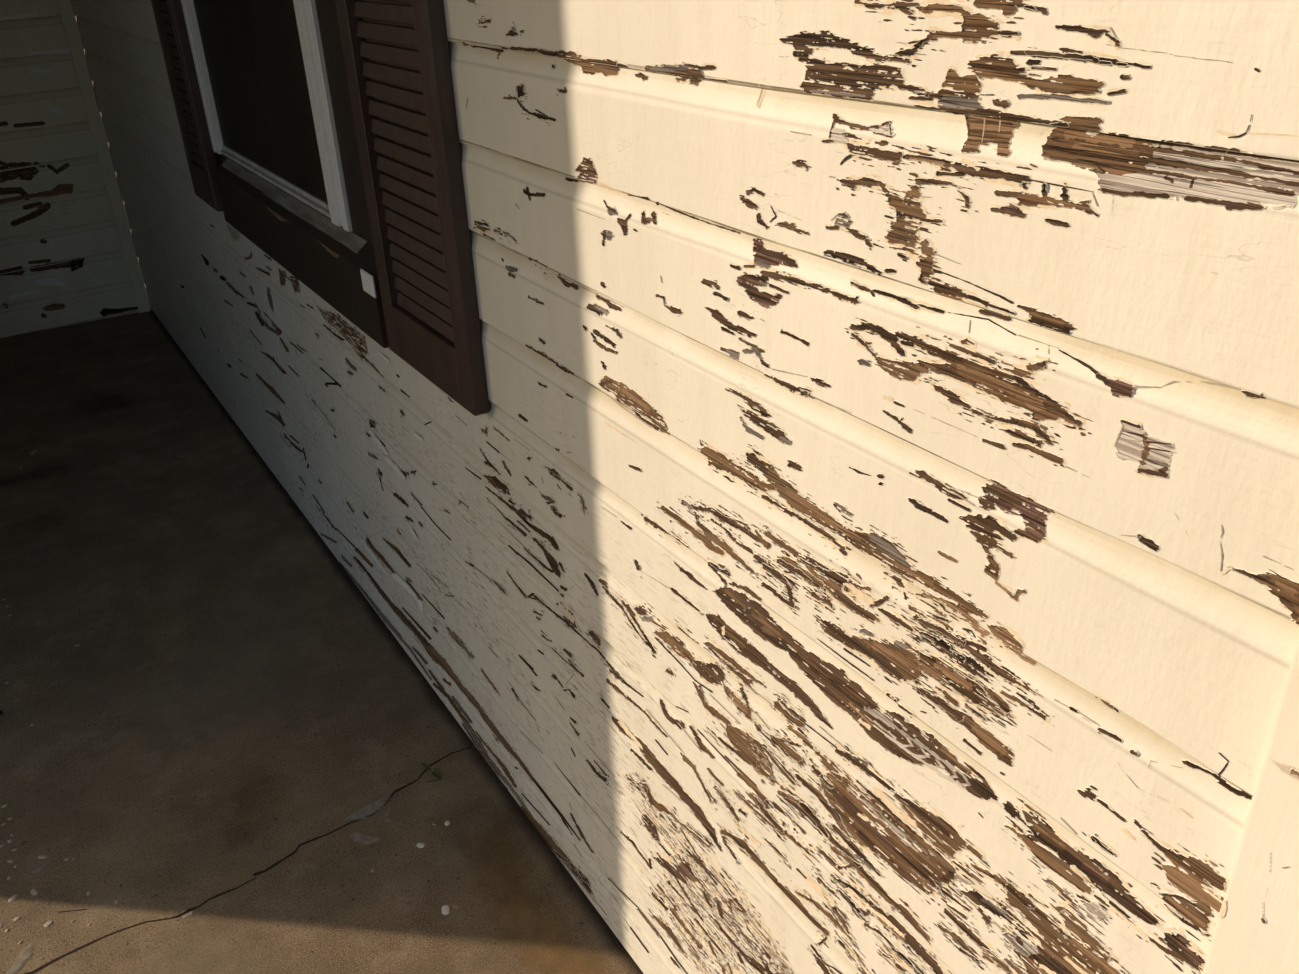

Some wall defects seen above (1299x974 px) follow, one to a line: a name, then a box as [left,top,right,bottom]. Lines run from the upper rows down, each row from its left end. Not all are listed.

spalling [461,22,732,96]
spalling [503,82,558,126]
peeling [0,160,74,227]
spalling [575,157,599,184]
spalling [577,200,658,247]
spalling [655,275,684,317]
peeling [557,273,672,436]
peeling [701,186,1093,478]
spalling [1095,372,1239,399]
peeling [200,327,595,884]
peeling [1220,556,1299,625]
crack [23,746,472,974]